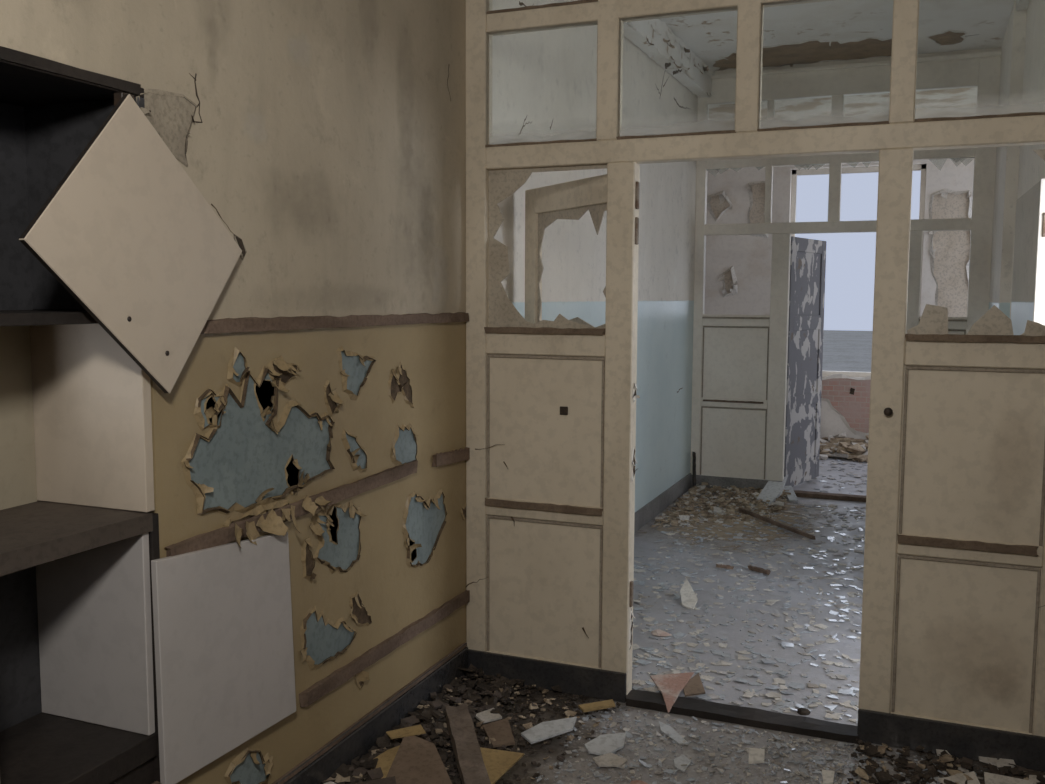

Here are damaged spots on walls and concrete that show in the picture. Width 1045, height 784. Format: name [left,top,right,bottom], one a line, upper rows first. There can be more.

peeling [646,24,736,74]
peeling [762,37,892,67]
peeling [926,30,967,45]
flaking render [136,89,197,167]
crack [186,73,203,152]
flaking render [233,234,247,260]
peeling [388,361,414,408]
flaking render [821,374,871,438]
peeling [181,346,376,584]
peeling [402,489,447,568]
peeling [300,591,372,670]
peeling [224,748,273,784]